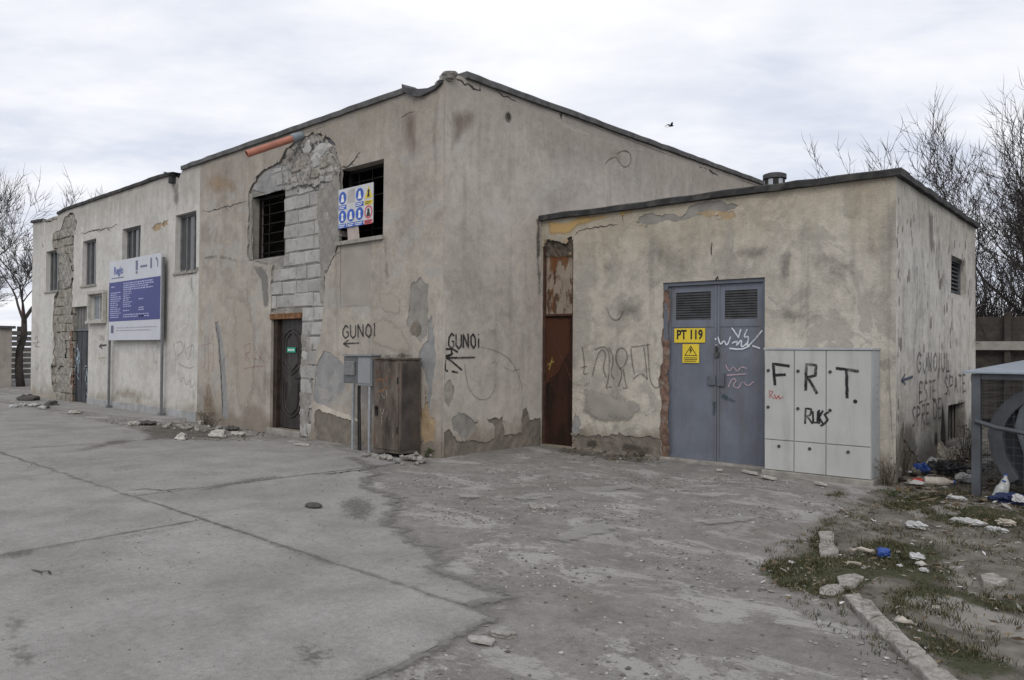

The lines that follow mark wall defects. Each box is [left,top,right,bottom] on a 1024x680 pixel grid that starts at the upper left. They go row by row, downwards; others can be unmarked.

spalling [51,213,79,402]
spalling [248,128,364,446]
peeling [407,278,541,458]
rust [546,289,570,383]
peeling [636,200,738,226]